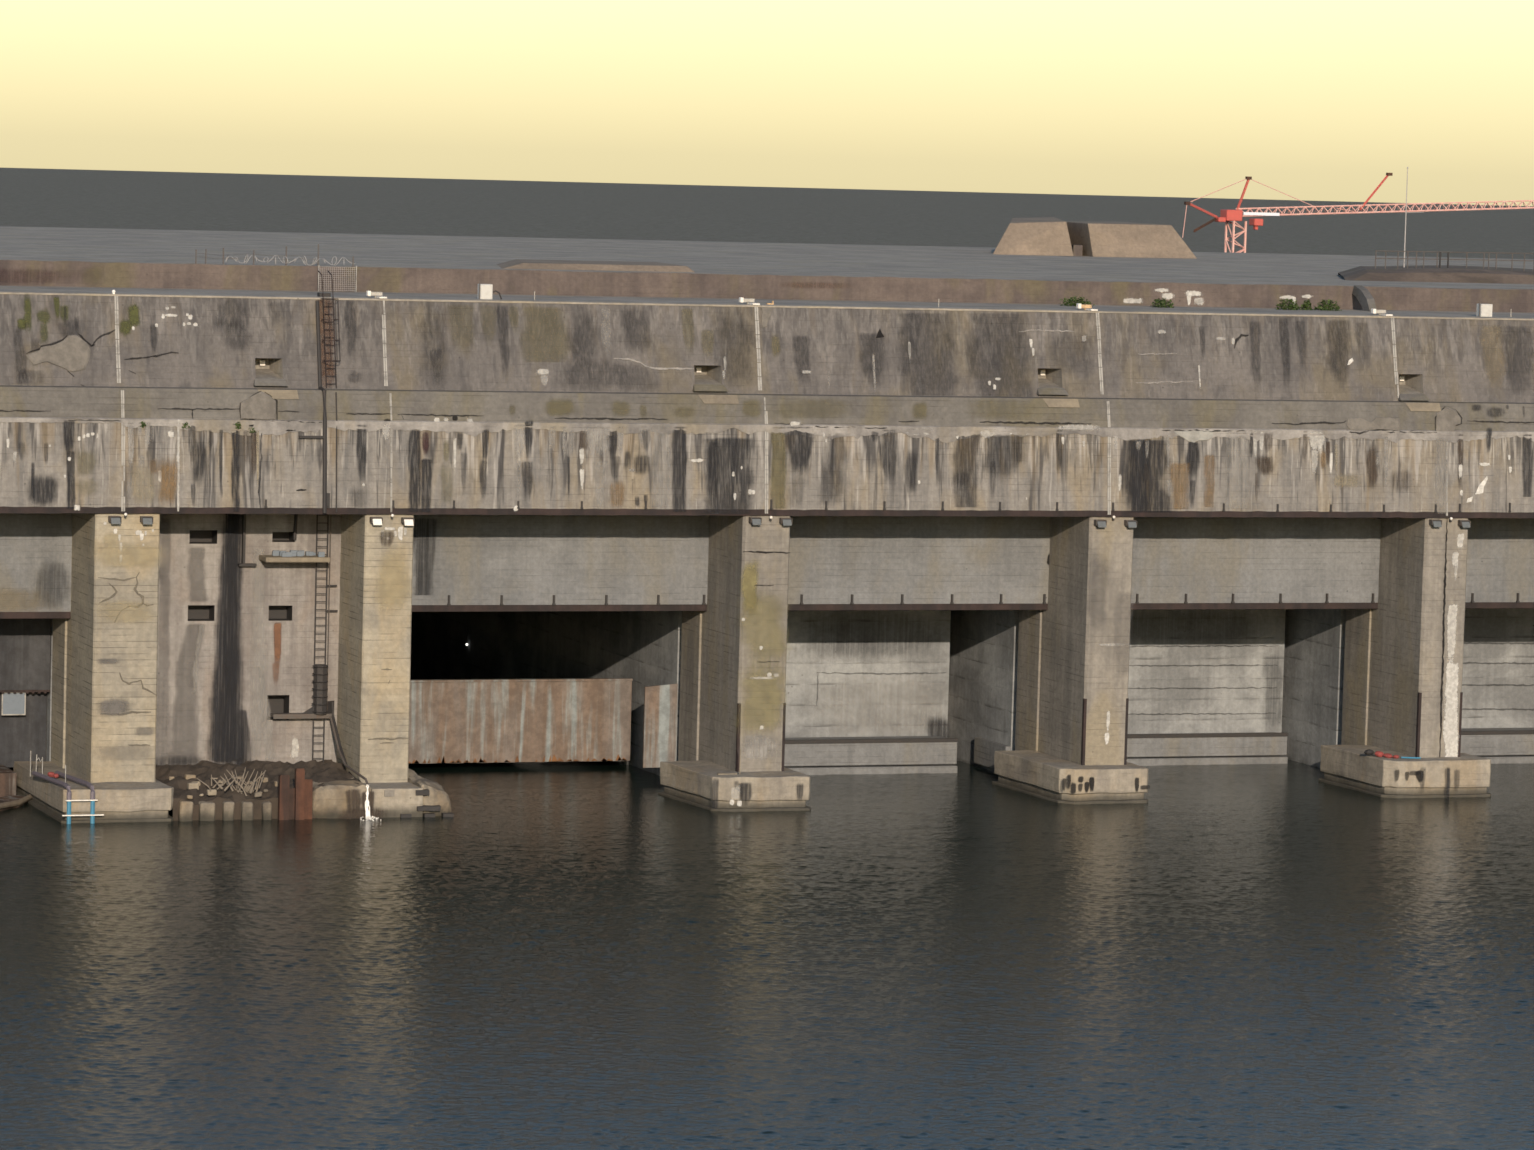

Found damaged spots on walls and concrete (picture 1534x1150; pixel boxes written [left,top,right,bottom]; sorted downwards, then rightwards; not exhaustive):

water stain [30,422,98,510]
water stain [357,426,366,486]
water stain [385,430,435,595]
water stain [550,402,647,505]
water stain [673,427,755,514]
water stain [787,427,812,469]
water stain [1118,435,1199,513]
water stain [1309,432,1388,486]
water stain [1446,409,1499,510]
water stain [1508,435,1531,497]
crack [98,573,154,623]
water stain [128,420,259,765]